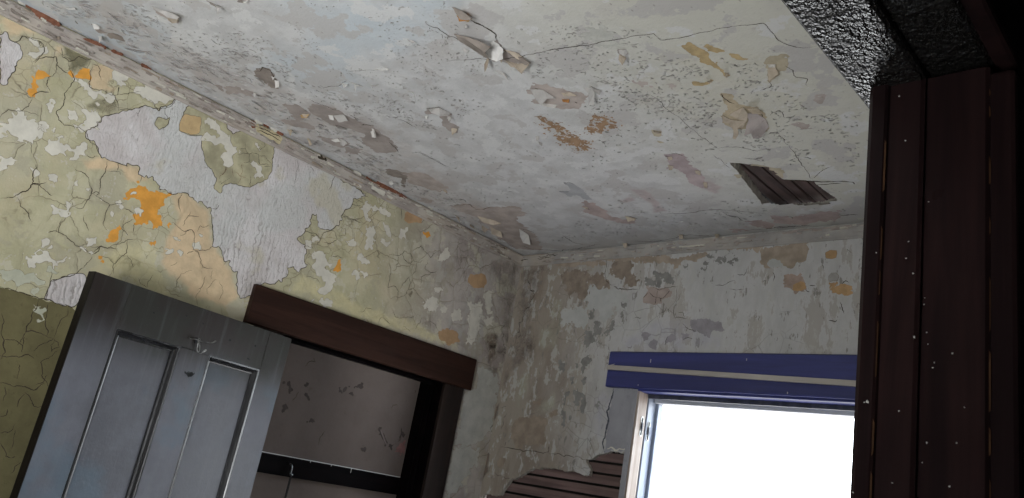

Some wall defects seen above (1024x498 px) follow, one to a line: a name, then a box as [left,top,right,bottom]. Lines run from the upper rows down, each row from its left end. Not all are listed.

crack [425,20,855,185]
crack [0,33,223,473]
crack [219,146,424,258]
flaking render [0,0,864,428]
water stain [511,292,568,420]
water stain [586,382,614,442]